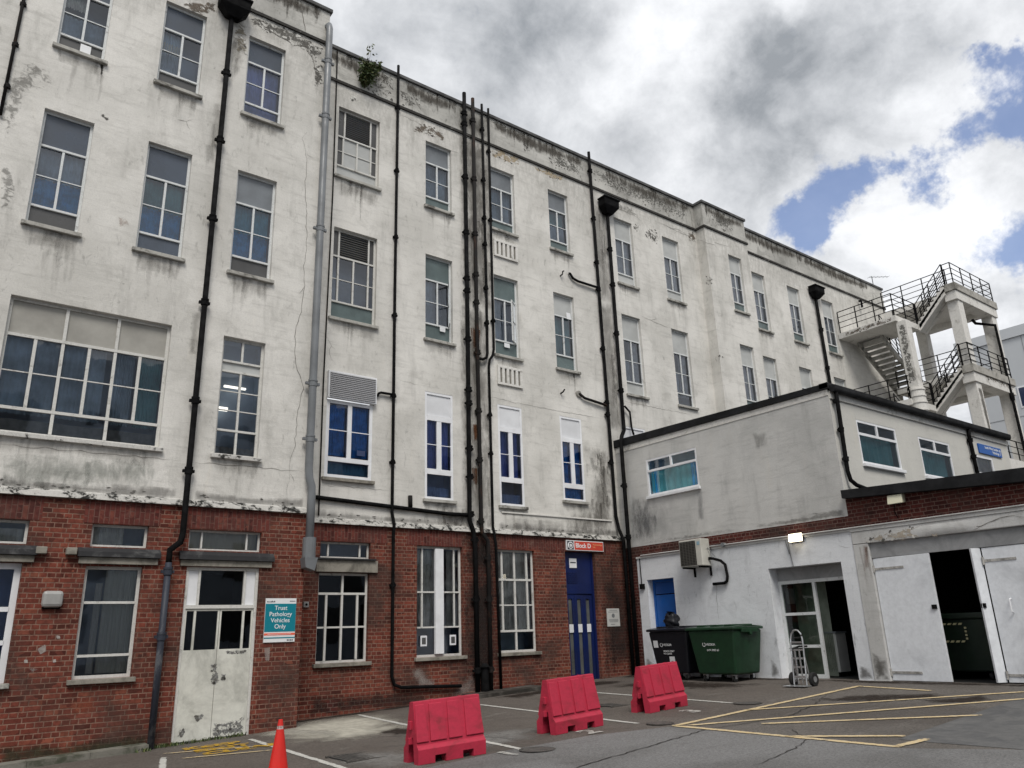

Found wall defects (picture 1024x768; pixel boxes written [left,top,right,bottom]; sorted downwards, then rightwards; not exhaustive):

flaking render [184,2,216,14]
flaking render [235,17,324,86]
flaking render [415,124,444,140]
leakage [496,124,581,164]
leakage [606,170,687,209]
crack [3,152,309,490]